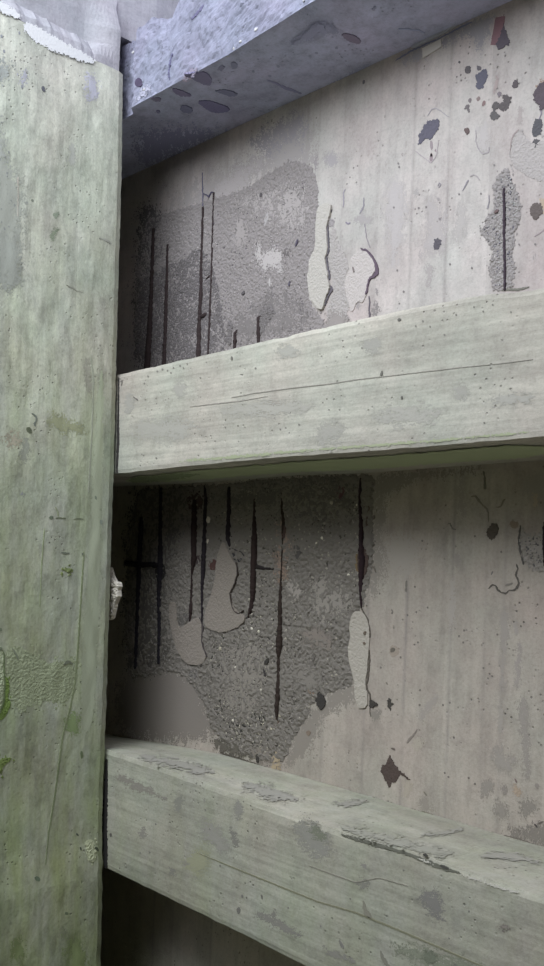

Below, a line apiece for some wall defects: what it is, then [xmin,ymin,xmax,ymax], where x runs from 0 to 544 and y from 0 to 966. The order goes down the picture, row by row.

spalling [132,159,375,385]
crack [324,189,379,318]
spalling [480,129,544,292]
spalling [124,473,377,768]
crack [341,834,460,873]